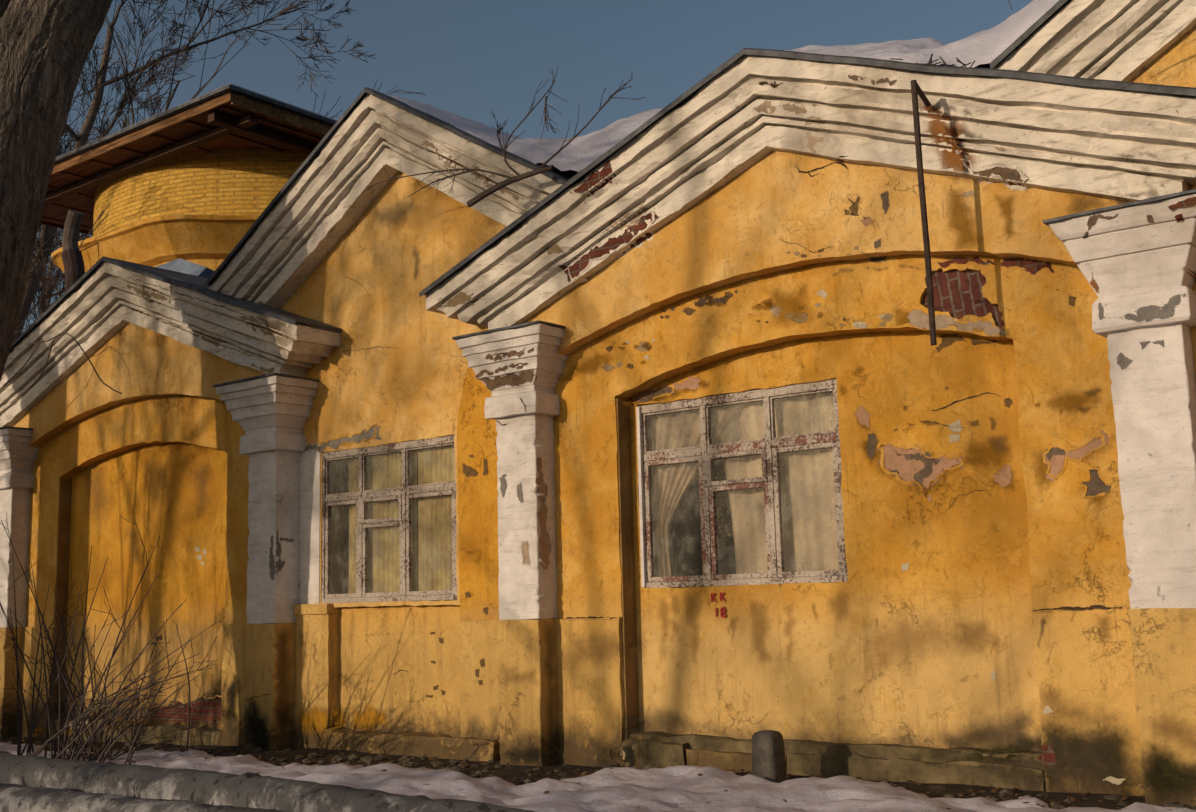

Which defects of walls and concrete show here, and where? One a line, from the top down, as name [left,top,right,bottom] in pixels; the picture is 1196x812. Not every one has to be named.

rust [925,105,972,177]
flaking render [547,203,661,283]
flaking render [1083,214,1118,239]
flaking render [1168,197,1196,223]
flaking render [839,257,1055,353]
peeling [1093,293,1186,324]
flaking render [475,347,537,391]
flaking render [855,405,995,502]
flaking render [1038,430,1113,502]
peeling [462,455,552,571]
crack [1033,604,1122,612]
water stain [279,635,385,732]